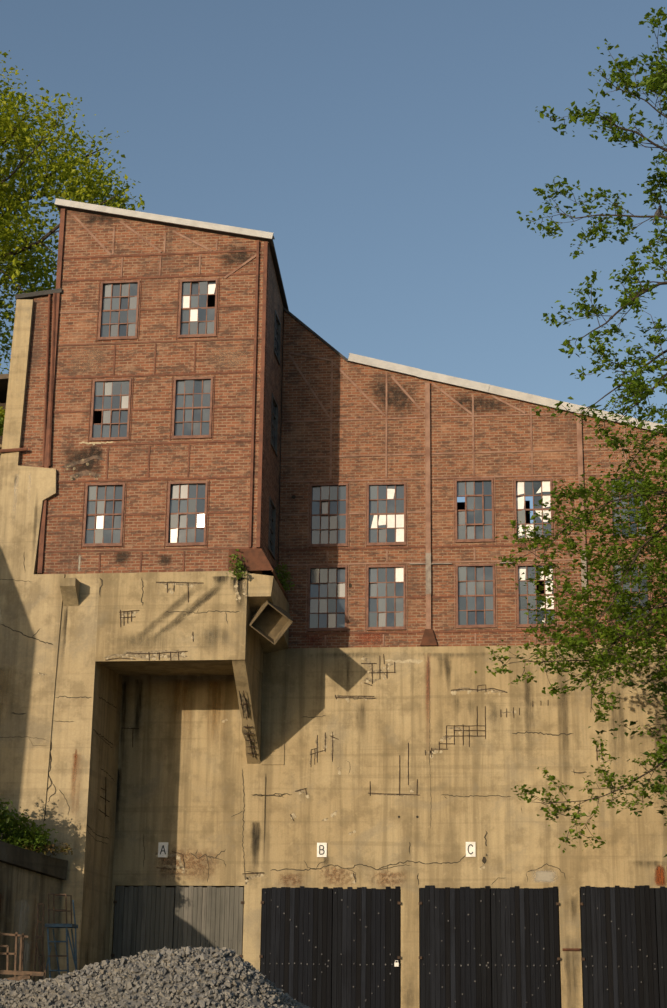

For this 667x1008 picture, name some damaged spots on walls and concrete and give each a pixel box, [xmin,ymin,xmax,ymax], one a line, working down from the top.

crack [0,696,117,844]
crack [191,769,488,885]
crack [428,658,522,829]
corrosion [655,866,665,885]